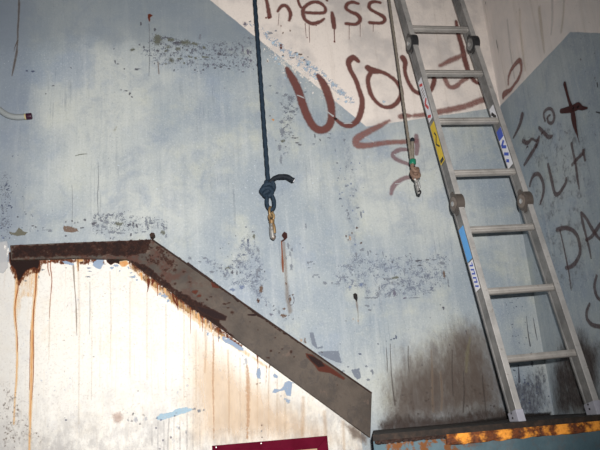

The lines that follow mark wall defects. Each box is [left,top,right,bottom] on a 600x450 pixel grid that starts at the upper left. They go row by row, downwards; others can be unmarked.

peeling [243,21,355,103]
peeling [273,92,300,164]
peeling [0,177,28,273]
peeling [63,210,167,239]
corrosion [9,232,300,450]
peeling [155,407,204,429]
peeling [273,381,293,403]
peeling [304,332,374,381]
water stain [381,338,509,430]
water stain [513,357,585,417]
water stain [579,339,597,388]